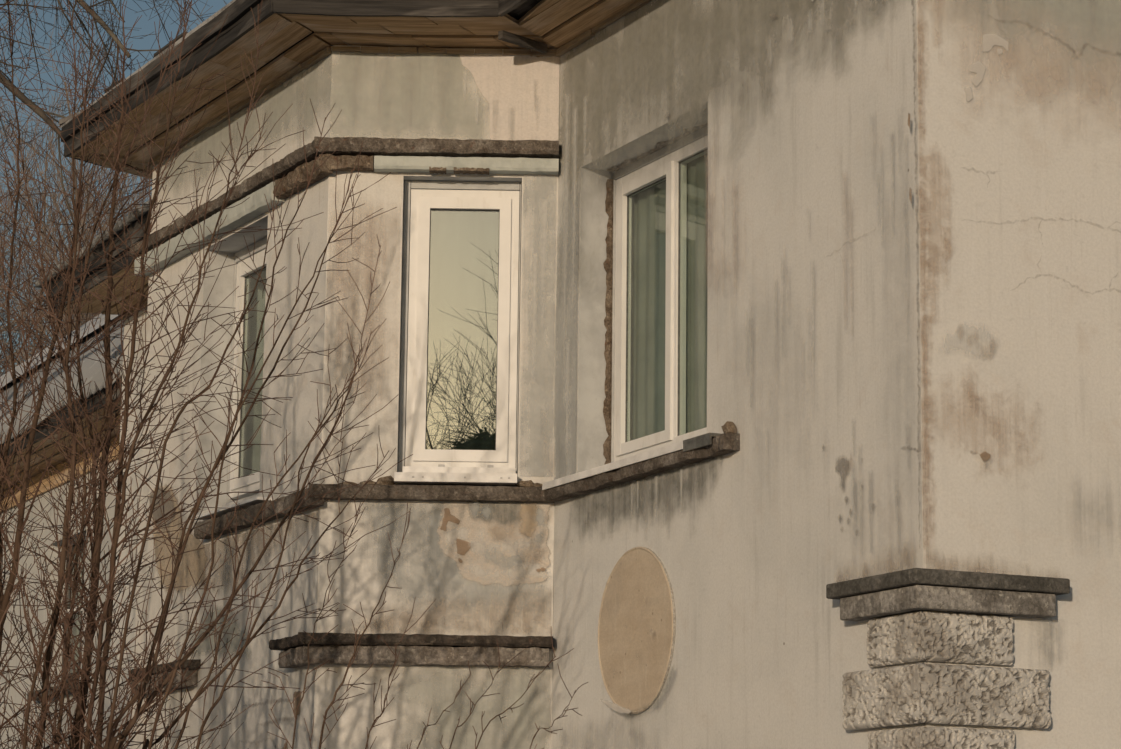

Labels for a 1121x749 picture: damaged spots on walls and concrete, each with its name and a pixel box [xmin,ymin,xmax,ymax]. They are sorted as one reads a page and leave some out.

water stain [158,52,483,184]
spalling [603,122,708,464]
water stain [524,0,886,479]
spalling [437,501,552,586]
water stain [578,458,714,526]